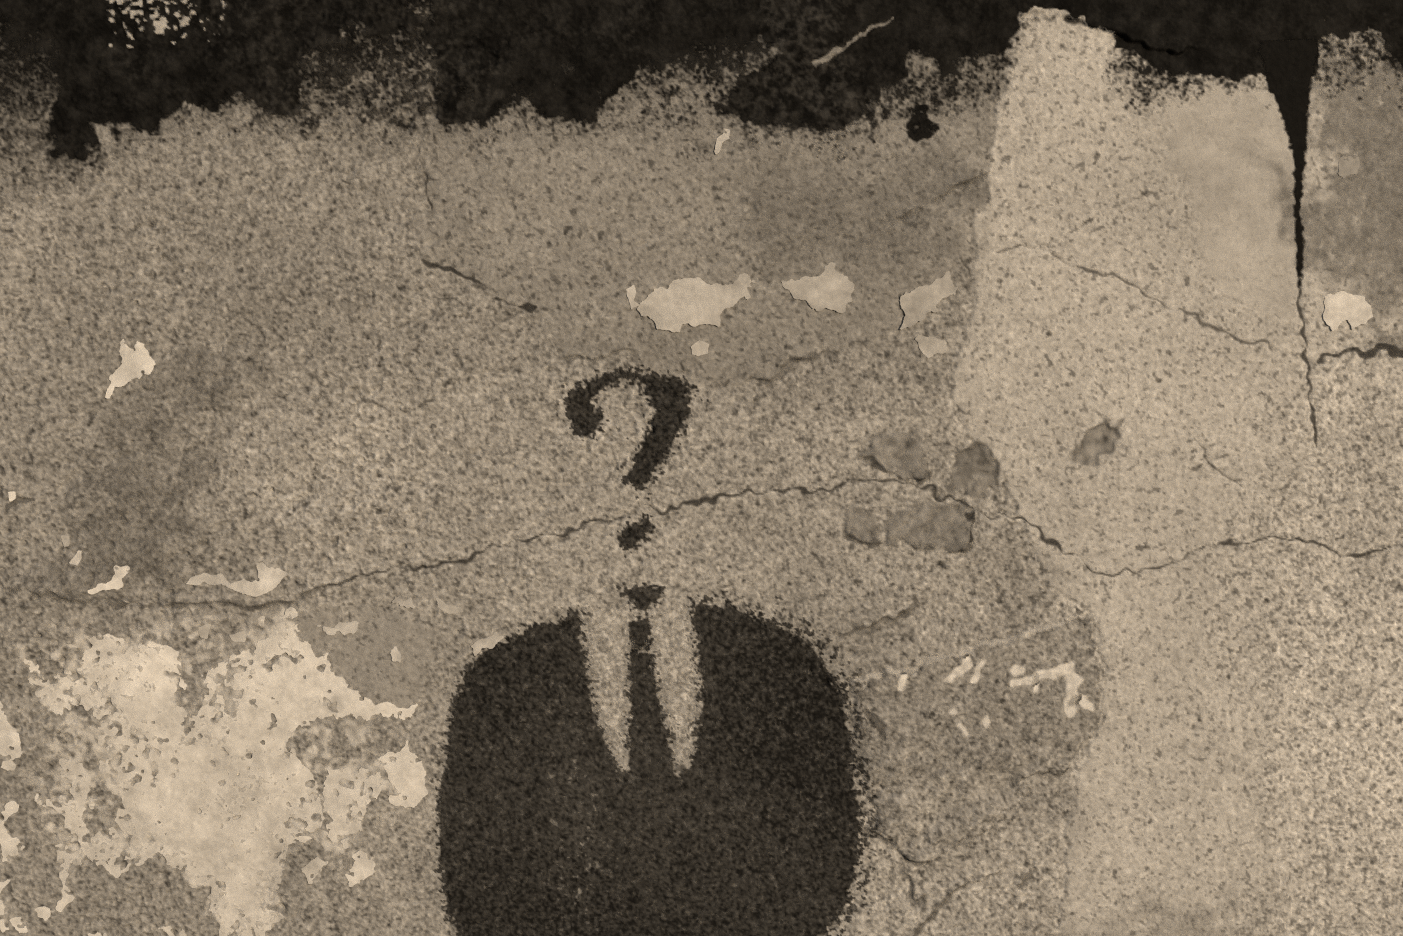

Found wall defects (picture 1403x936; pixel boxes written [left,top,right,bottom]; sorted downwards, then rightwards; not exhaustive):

peeling [626,273,755,356]
peeling [781,262,854,313]
peeling [900,271,958,358]
peeling [1322,291,1373,331]
peeling [105,339,156,399]
crack [1297,289,1403,447]
crack [328,517,621,585]
crack [653,482,846,515]
flaking render [949,443,999,499]
crack [879,480,1163,576]
crack [1220,536,1386,557]
peeling [0,562,428,936]